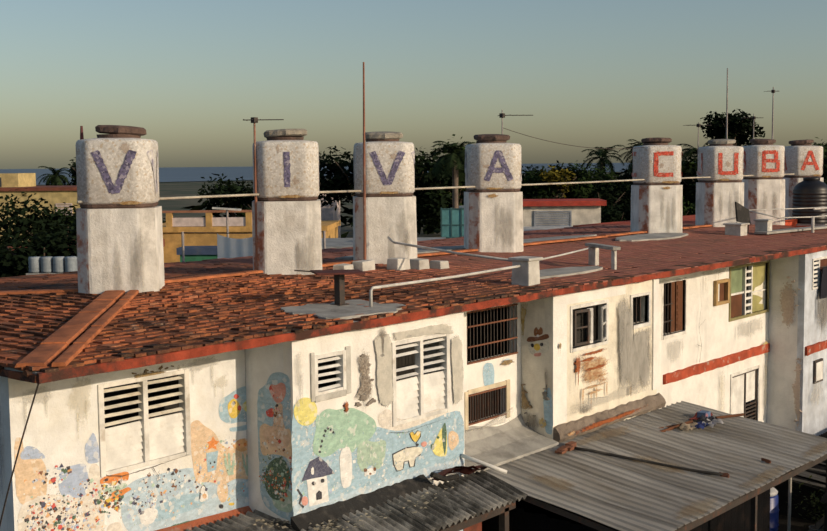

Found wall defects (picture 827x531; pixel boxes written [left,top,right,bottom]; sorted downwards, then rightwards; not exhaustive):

spalling [343,351,376,412]
peeling [394,324,463,404]
spalling [581,348,608,405]
water stain [619,299,629,358]
peeling [619,306,651,390]